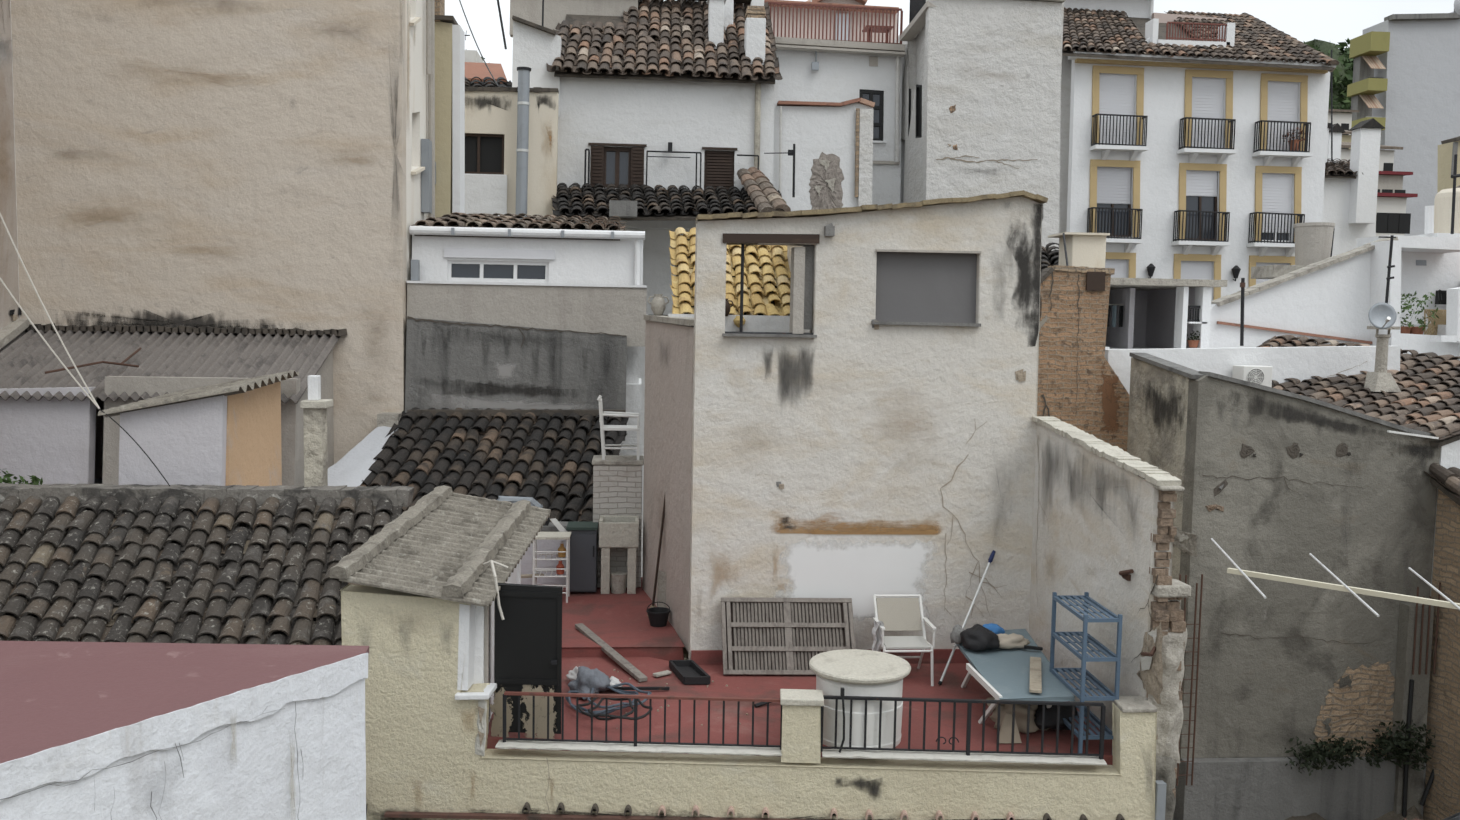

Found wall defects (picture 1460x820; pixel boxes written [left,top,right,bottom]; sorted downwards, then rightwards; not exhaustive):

leakage [76,311,239,334]
leakage [765,355,812,394]
crack [940,272,1080,617]
leakage [1010,204,1043,347]
leakage [1146,387,1182,430]
spalling [1137,490,1203,798]
crack [0,703,303,820]